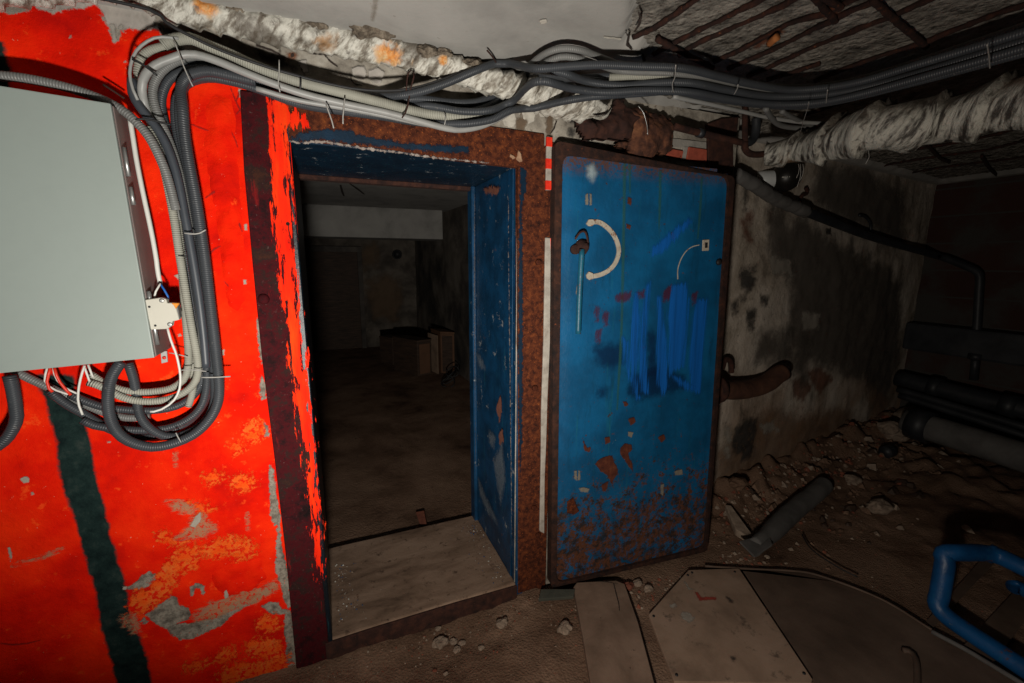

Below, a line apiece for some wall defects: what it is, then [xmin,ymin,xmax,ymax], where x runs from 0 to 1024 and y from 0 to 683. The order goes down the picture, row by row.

flaking render [352,66,385,84]
spalling [627,0,1024,84]
spalling [660,58,1024,138]
spalling [866,130,1024,179]
water stain [813,165,904,242]
water stain [733,208,902,417]
peeling [224,415,270,457]
rust [582,437,633,492]
water stain [719,411,847,478]
spalling [120,465,296,683]